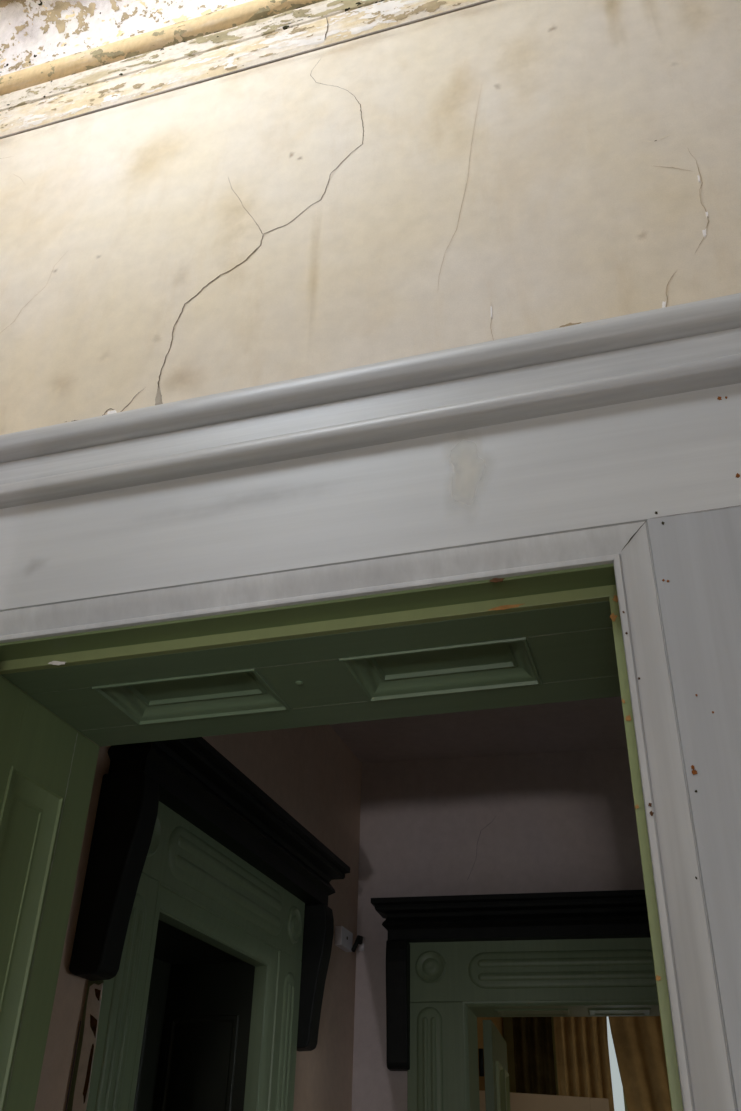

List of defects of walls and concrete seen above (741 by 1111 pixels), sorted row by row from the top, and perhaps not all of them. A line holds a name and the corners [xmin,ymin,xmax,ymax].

peeling [0,0,461,128]
crack [65,17,364,422]
crack [656,149,709,253]
crack [662,272,676,308]